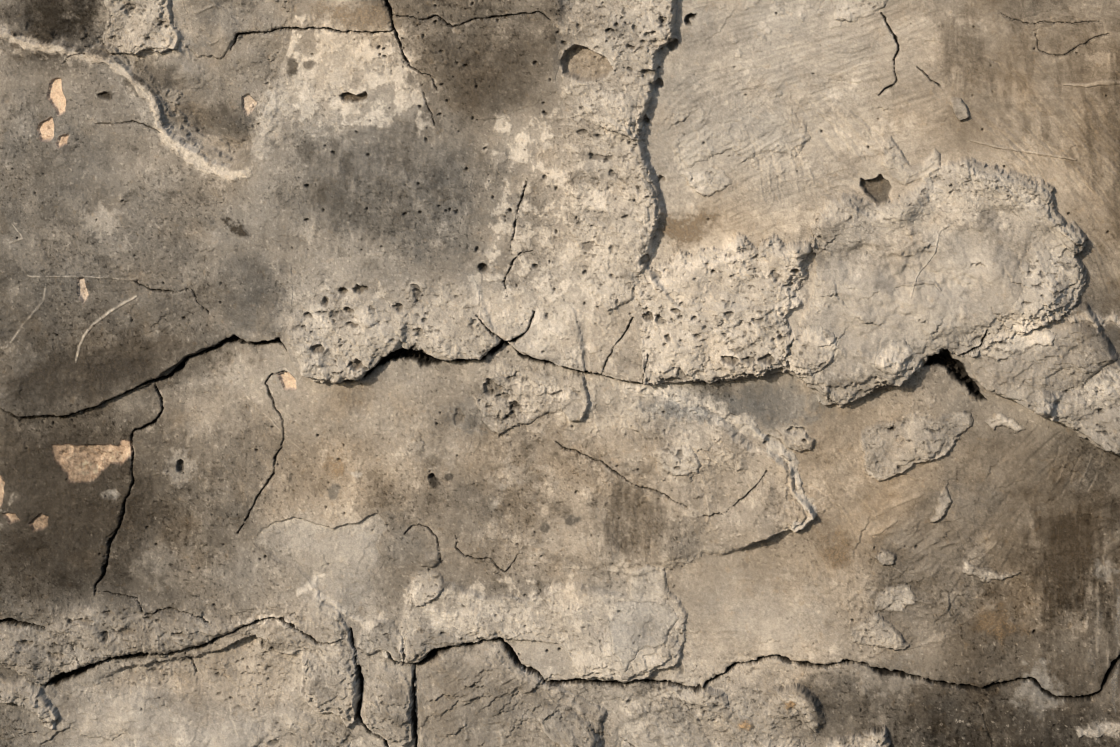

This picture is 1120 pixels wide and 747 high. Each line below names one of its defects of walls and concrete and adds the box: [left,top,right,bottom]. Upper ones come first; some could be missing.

spalling [0,0,294,183]
crack [230,0,551,127]
crack [879,14,940,96]
crack [998,12,1110,57]
crack [503,179,534,297]
flaking render [286,269,586,384]
crack [336,312,651,386]
flaking render [357,0,1120,747]
spalling [52,440,133,501]
crack [0,328,1120,747]
flaking render [0,596,253,730]
spalling [52,513,390,747]